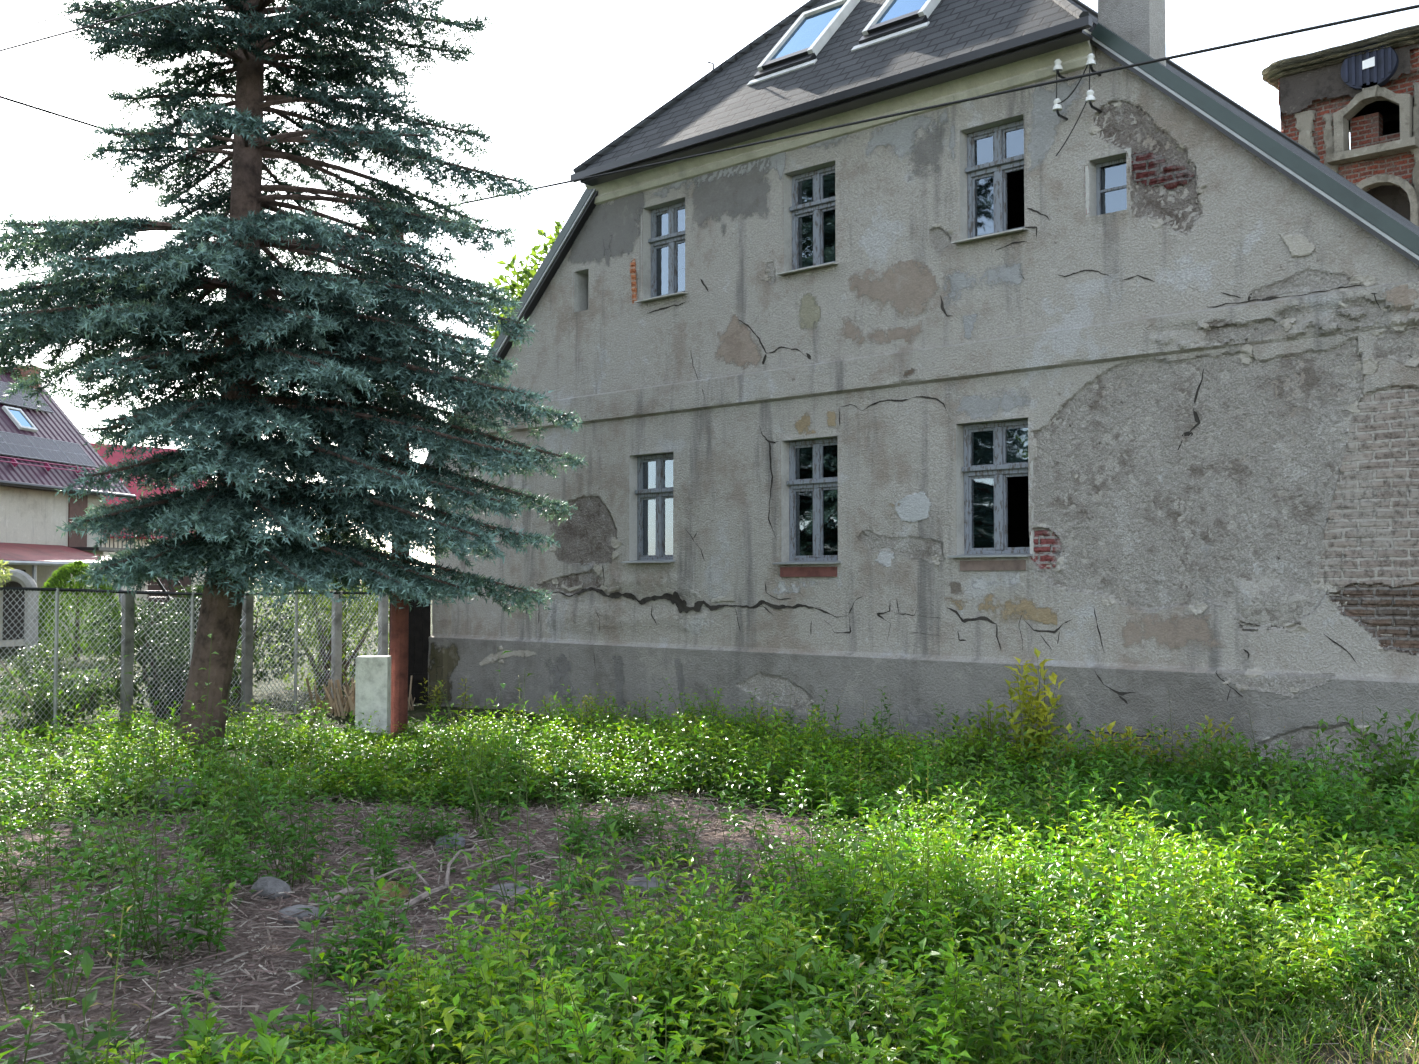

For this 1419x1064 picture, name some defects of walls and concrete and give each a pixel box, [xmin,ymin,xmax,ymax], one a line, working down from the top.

flaking render [1088,100,1208,235]
crack [1178,369,1204,450]
spalling [1028,234,1419,654]
spalling [537,495,622,598]
spalling [736,672,814,714]
crack [538,565,1157,737]